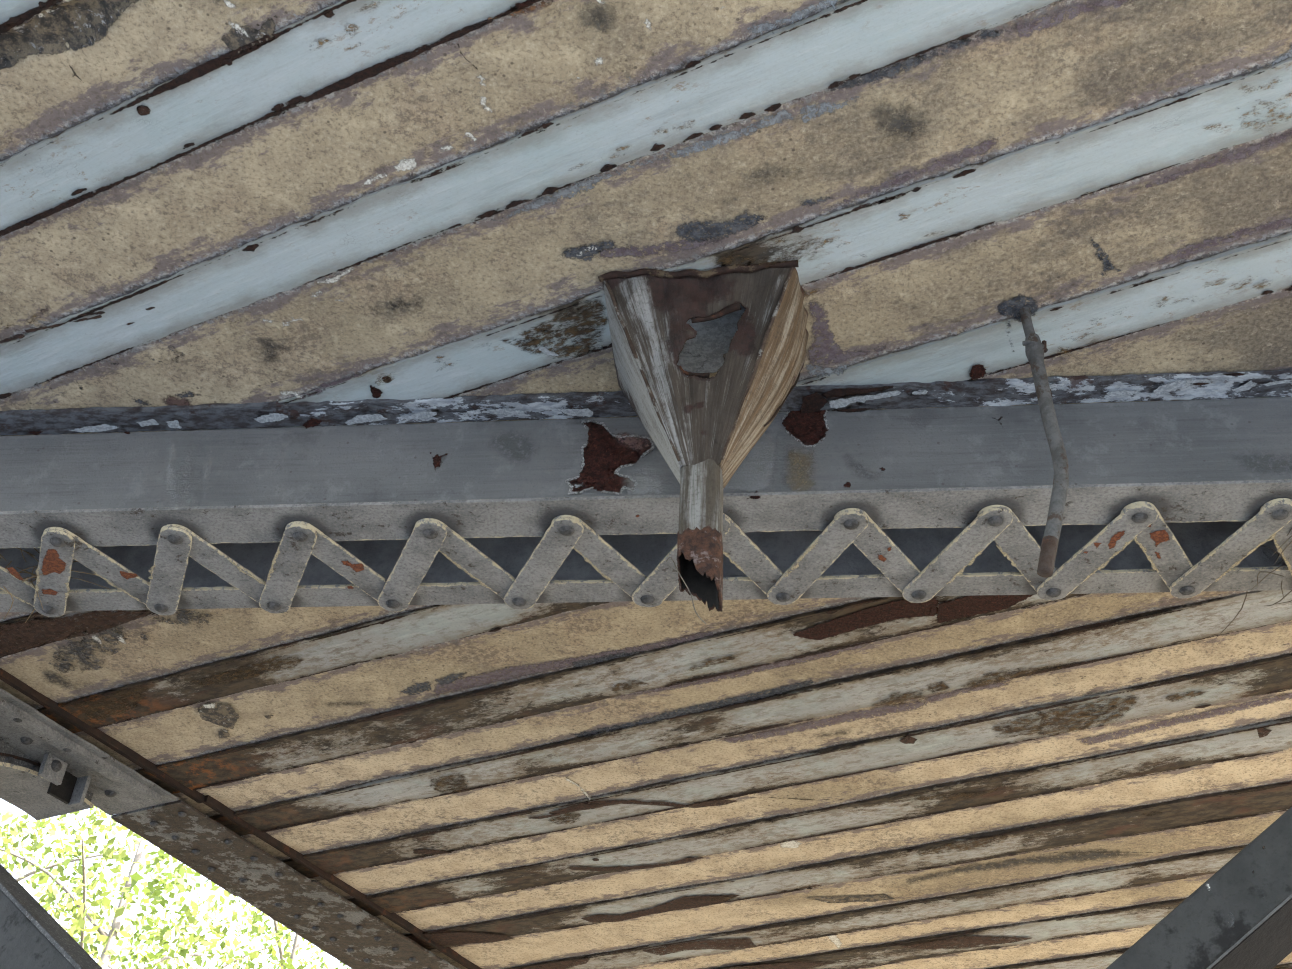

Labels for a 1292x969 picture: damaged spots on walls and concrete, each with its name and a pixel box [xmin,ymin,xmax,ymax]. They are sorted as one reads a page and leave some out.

spalling [0,0,139,70]
spalling [221,15,277,53]
rust [828,11,1028,89]
rust [0,0,553,237]
rust [739,103,781,119]
rust [304,120,722,285]
rust [1,207,349,328]
peeling [136,419,182,429]
peeling [254,413,288,423]
peeling [345,411,437,425]
rust [612,593,1093,694]
spalling [808,895,895,903]